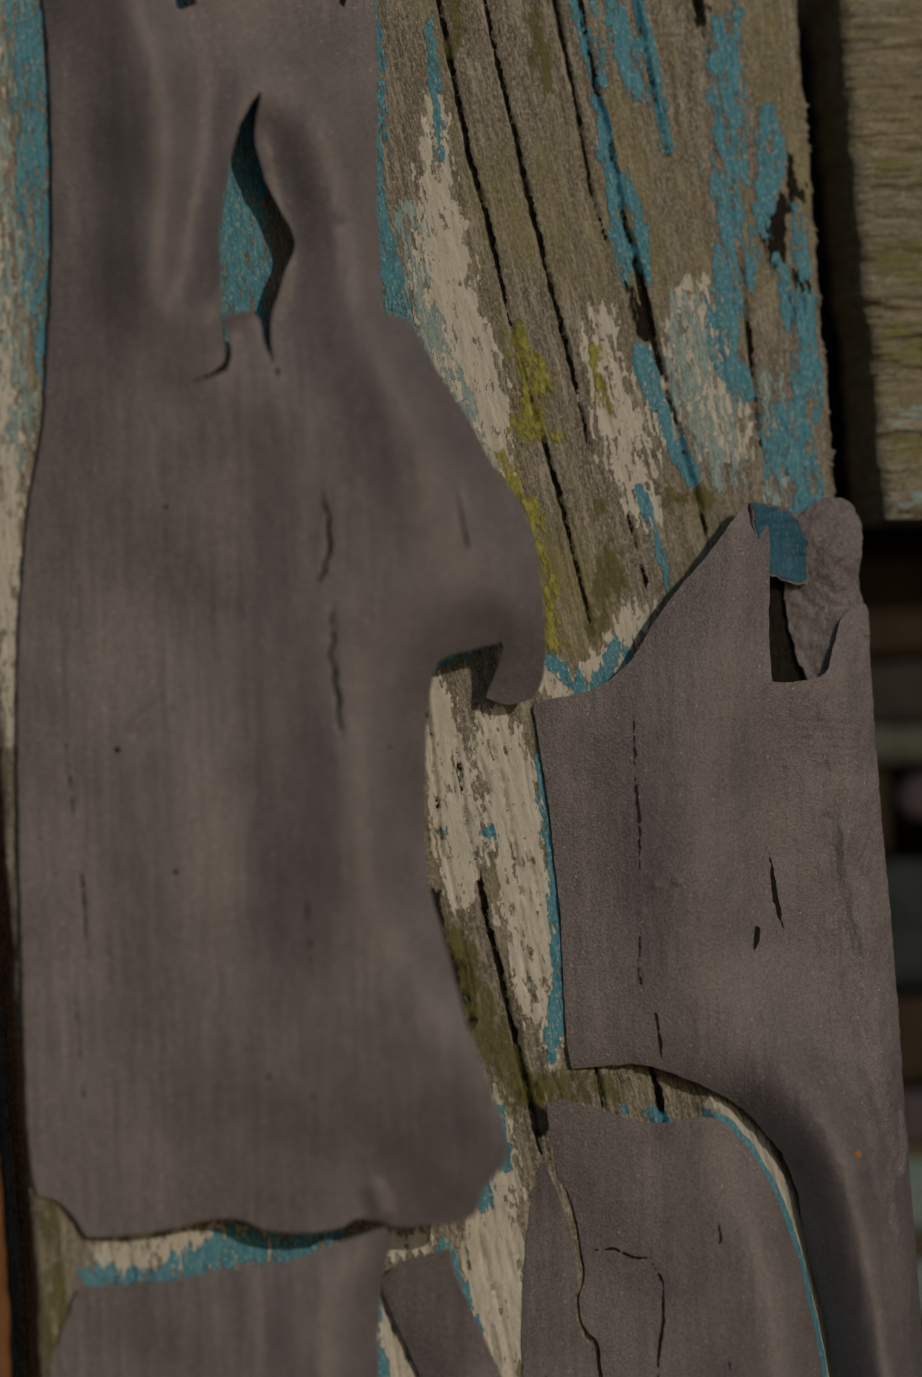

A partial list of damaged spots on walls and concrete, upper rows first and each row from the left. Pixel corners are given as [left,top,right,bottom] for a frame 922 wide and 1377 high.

peeling [220,104,276,349]
crack [436,0,591,632]
crack [552,0,689,455]
peeling [568,0,777,592]
peeling [752,102,787,241]
peeling [757,201,825,517]
crack [318,489,343,730]
peeling [538,628,635,698]
peeling [612,597,649,676]
crack [693,490,707,538]
peeling [49,1227,434,1377]
crack [594,1247,666,1377]